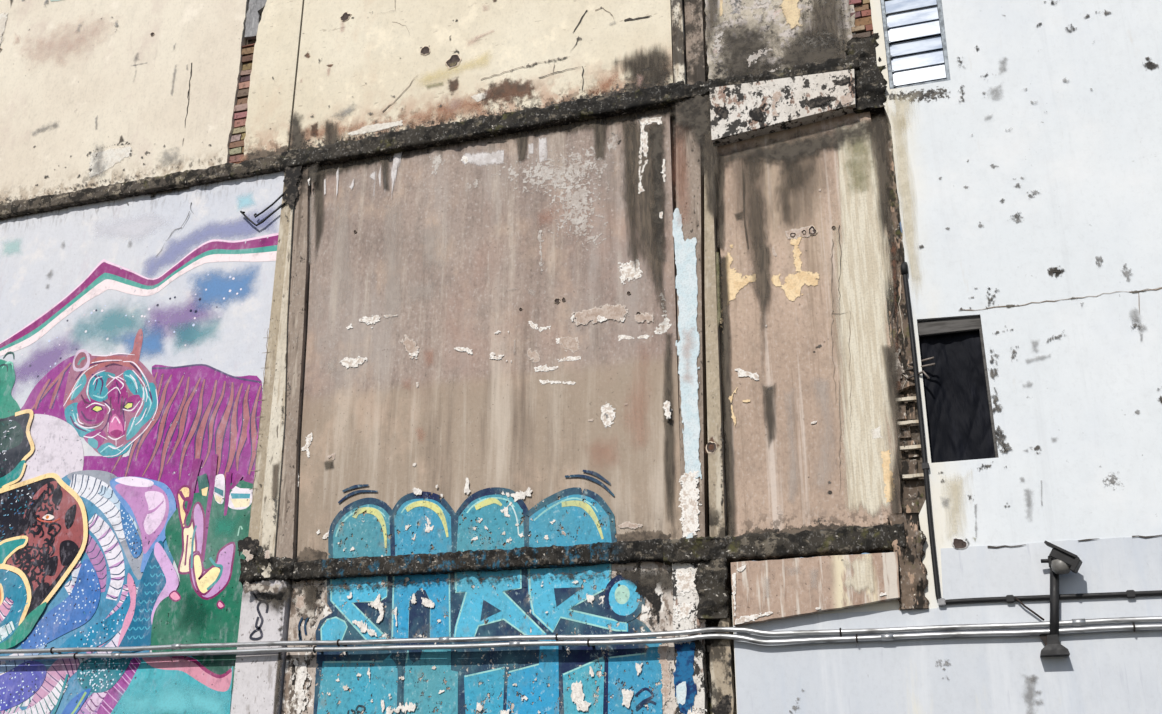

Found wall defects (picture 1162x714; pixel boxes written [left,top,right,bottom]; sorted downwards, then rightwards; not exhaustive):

rust [311,78,534,136]
damp [289,57,671,149]
rust [623,49,662,81]
damp [707,0,846,79]
peeling [805,76,854,109]
flaking render [849,0,874,38]
damp [150,187,190,198]
damp [282,85,964,536]
peeling [831,122,936,515]
crack [967,287,1162,314]
peeling [352,594,397,637]
peeling [616,567,706,630]